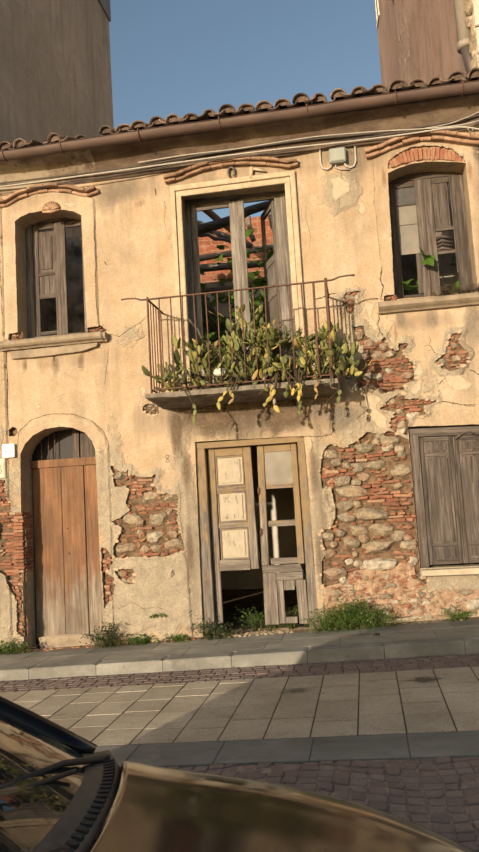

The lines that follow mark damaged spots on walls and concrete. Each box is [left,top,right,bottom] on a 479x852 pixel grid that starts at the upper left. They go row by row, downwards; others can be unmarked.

flaking render [331,178,350,200]
flaking render [317,289,479,621]
flaking render [0,480,34,638]
flaking render [102,464,185,606]